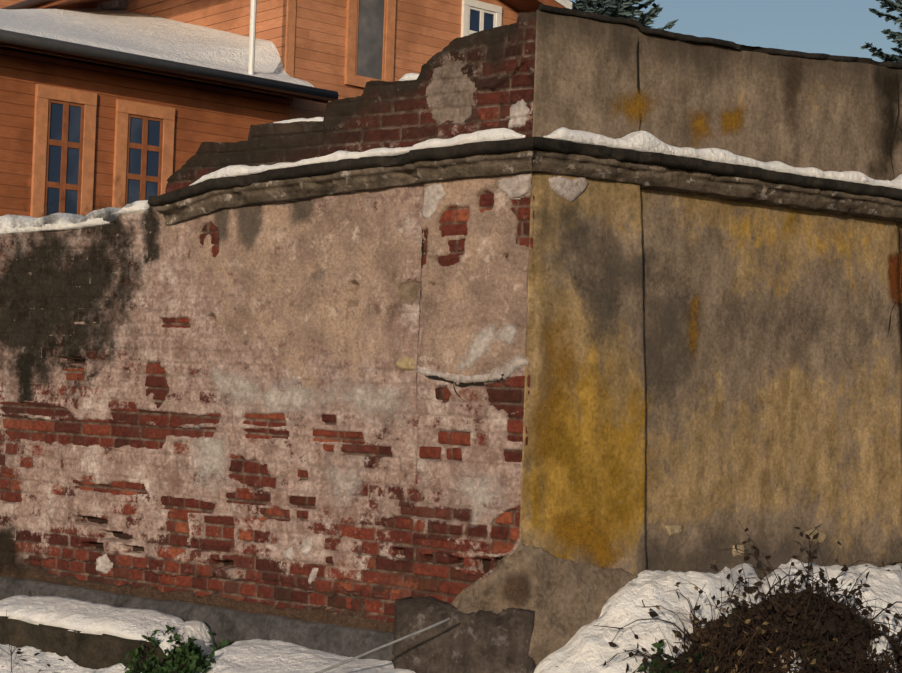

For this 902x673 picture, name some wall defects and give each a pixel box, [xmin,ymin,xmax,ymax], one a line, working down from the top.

flaking render [425,59,534,129]
damp [142,205,159,263]
spalling [422,174,535,267]
rust [889,255,902,306]
damp [17,352,35,403]
spalling [0,359,221,449]
flaking render [395,324,530,462]
damp [644,294,696,393]
crack [887,302,902,338]
spalling [226,454,316,522]
damp [641,537,867,578]
damp [878,543,902,567]